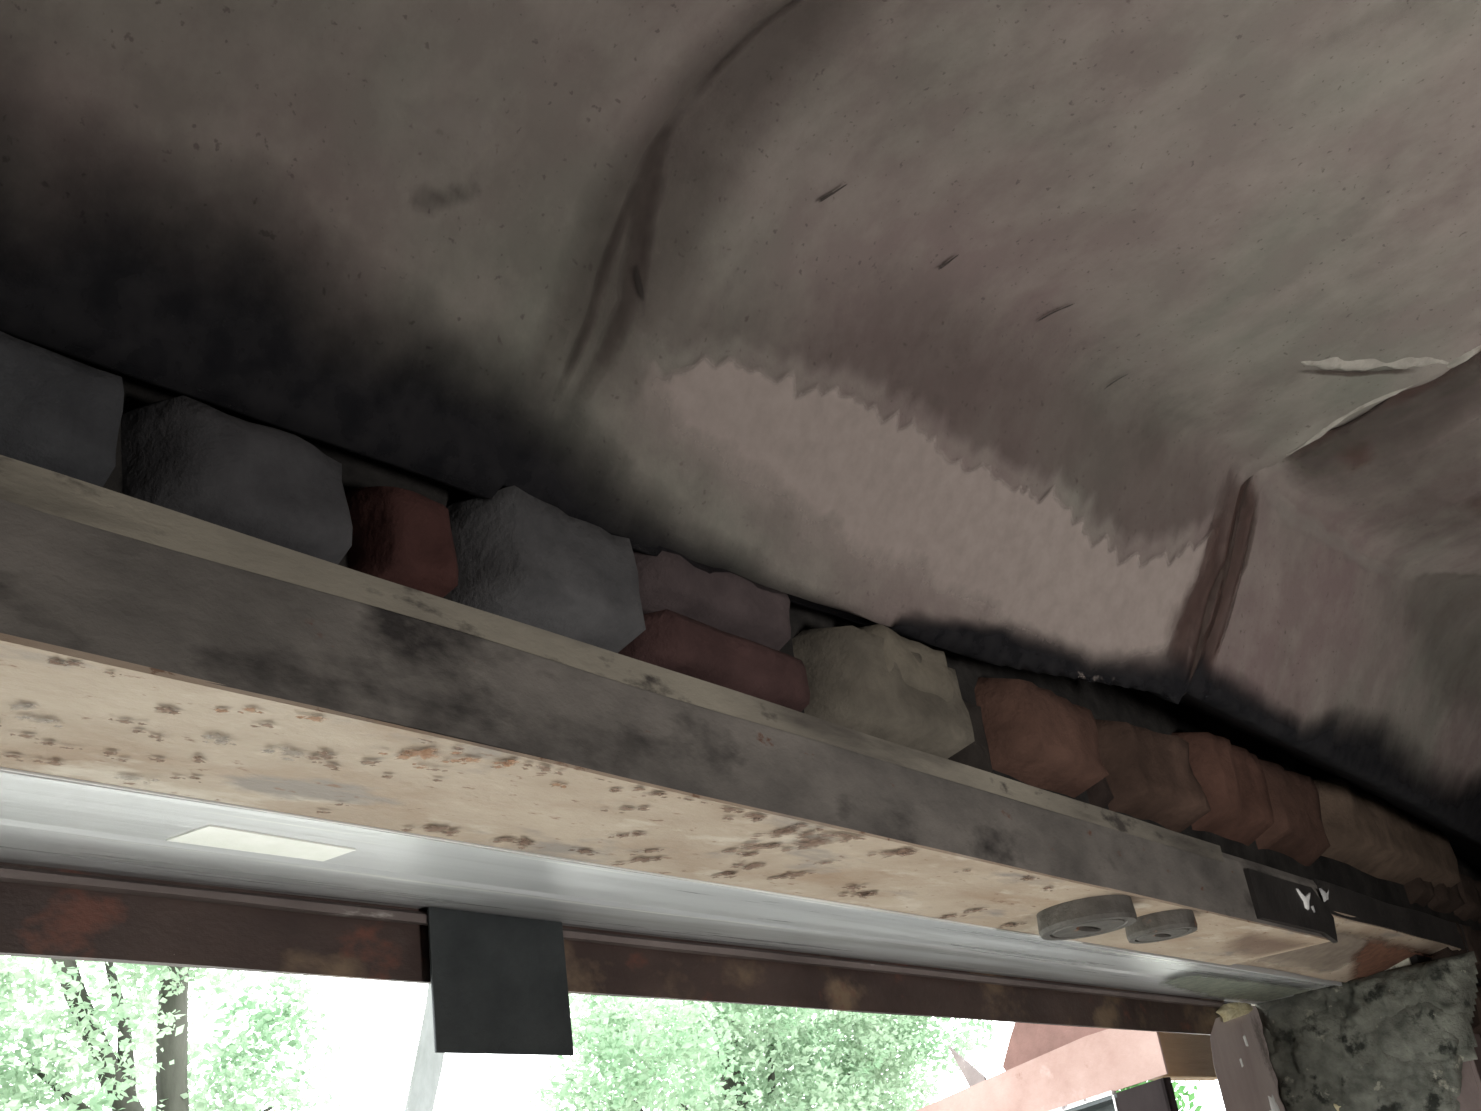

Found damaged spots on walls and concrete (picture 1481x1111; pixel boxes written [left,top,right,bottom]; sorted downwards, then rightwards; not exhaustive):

leakage [652,359,1217,664]
peeling [1268,1095,1280,1111]